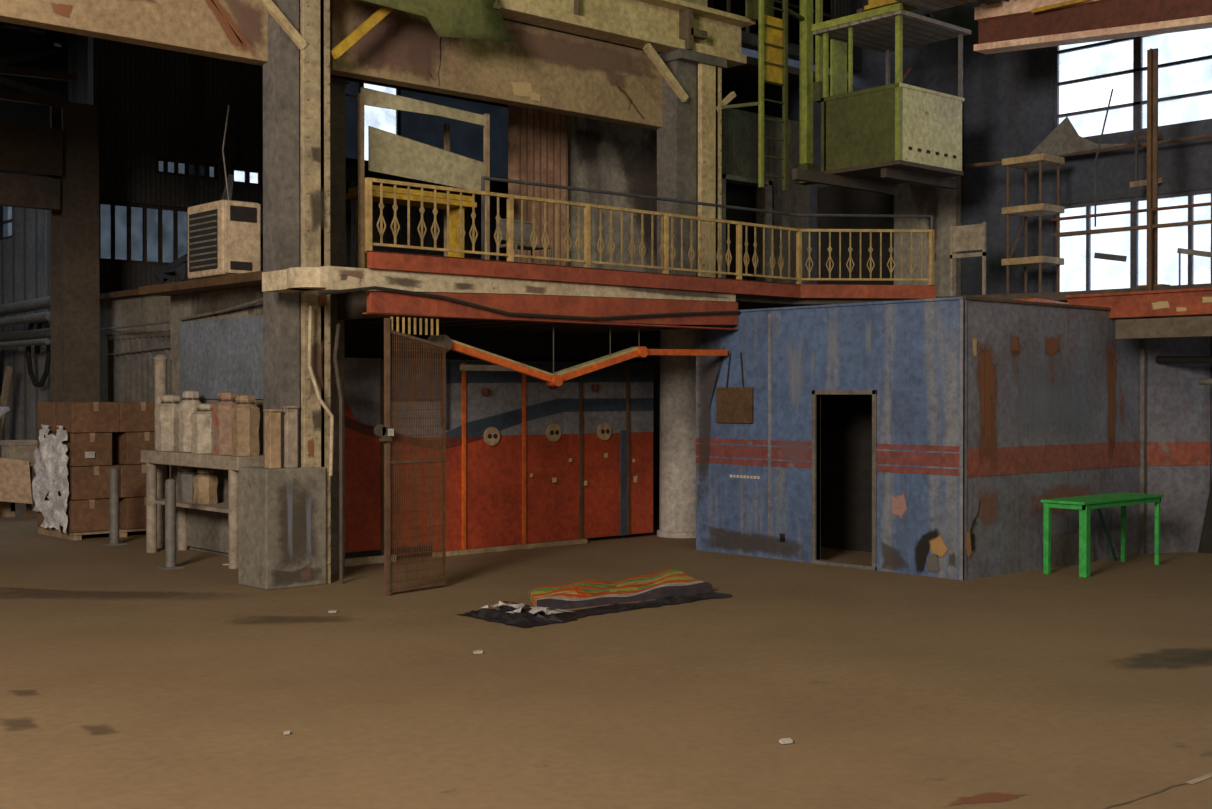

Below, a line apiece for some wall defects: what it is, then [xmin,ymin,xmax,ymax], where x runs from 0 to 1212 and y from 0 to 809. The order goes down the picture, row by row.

rust [206,0,254,50]
spalling [915,530,975,572]